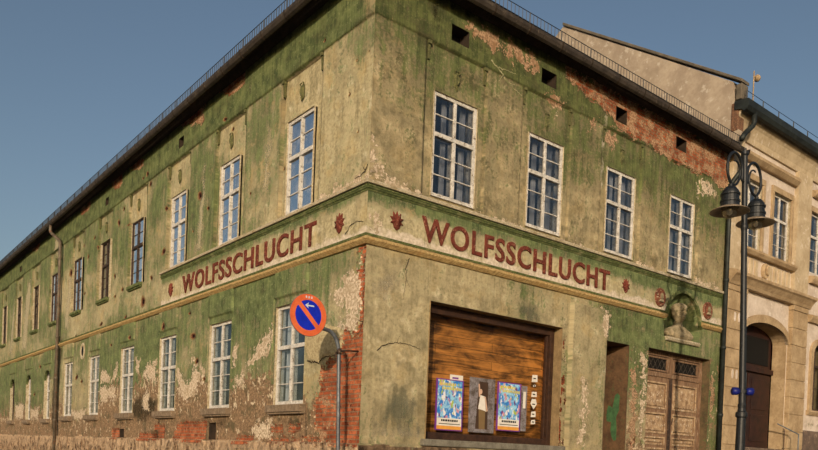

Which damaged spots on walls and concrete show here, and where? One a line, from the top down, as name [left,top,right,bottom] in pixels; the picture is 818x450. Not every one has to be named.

peeling [463,19,540,75]
flaking render [565,66,730,198]
flaking render [136,419,207,443]
flaking render [176,356,206,403]
flaking render [231,246,366,449]
peeling [627,352,648,450]